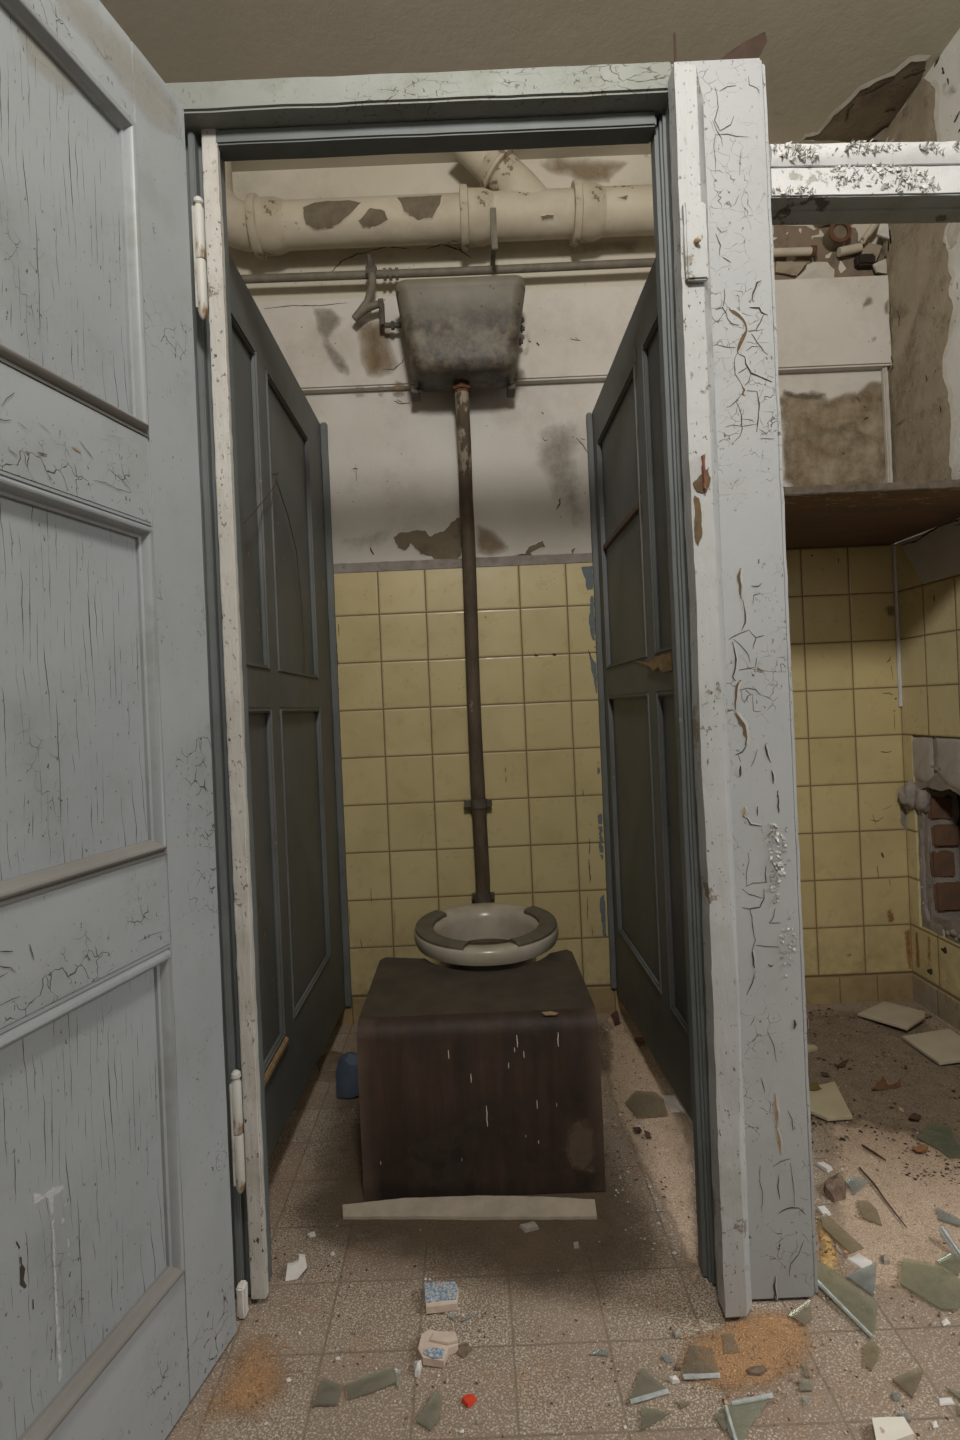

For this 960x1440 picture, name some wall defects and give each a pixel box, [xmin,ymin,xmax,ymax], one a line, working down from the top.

crack [713,76,759,168]
peeling [772,184,816,196]
peeling [772,54,960,193]
crack [716,230,772,442]
peeling [773,223,960,482]
crack [0,393,131,493]
peeling [394,516,462,559]
spalling [512,539,546,556]
crack [730,559,780,994]
spalling [872,735,960,954]
crack [0,945,34,1006]
crack [759,1020,806,1301]